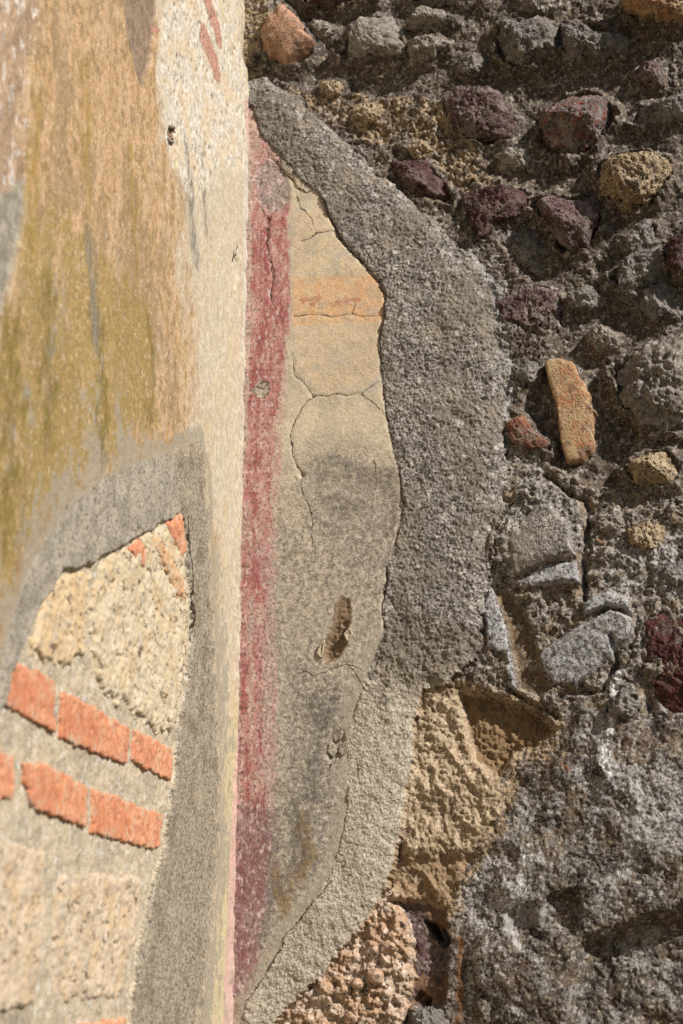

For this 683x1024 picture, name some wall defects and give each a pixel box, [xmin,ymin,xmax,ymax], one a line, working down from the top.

crack [262,152,387,566]
spalling [0,513,194,1024]
crack [247,880,332,1000]
spalling [317,595,353,664]
crack [374,461,403,628]
spalling [273,684,551,1024]